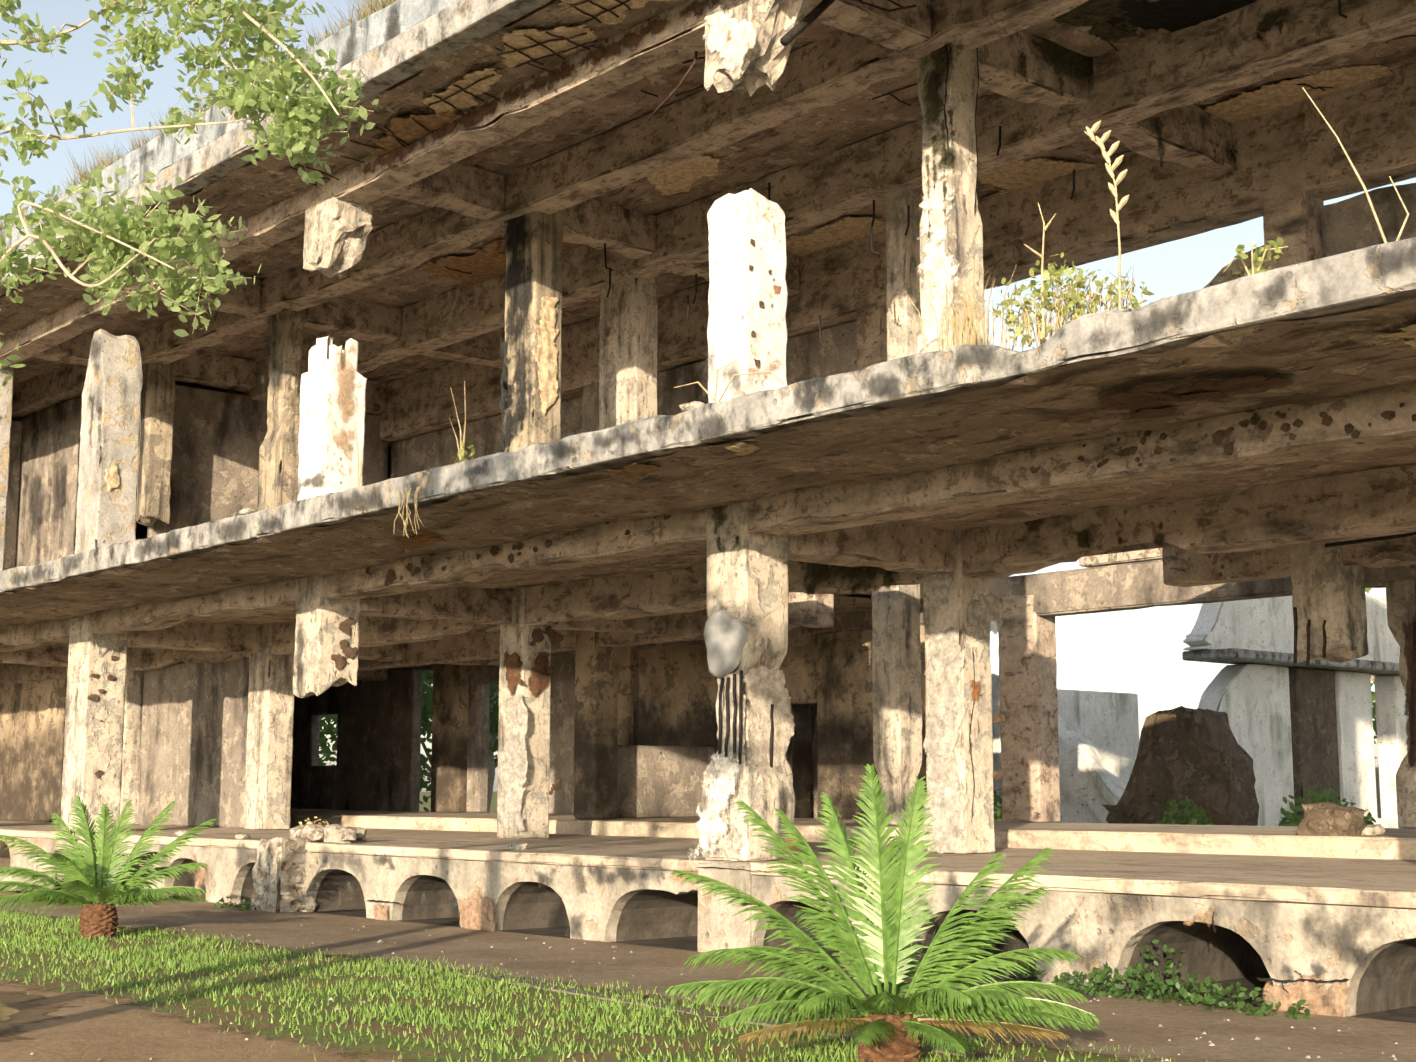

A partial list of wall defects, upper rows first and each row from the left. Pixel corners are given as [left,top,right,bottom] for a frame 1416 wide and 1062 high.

spalling [780,0,835,46]
peeling [1054,0,1139,51]
spalling [340,0,678,163]
spalling [641,5,756,120]
water stain [925,109,955,238]
water stain [1265,276,1285,302]
water stain [464,214,533,483]
water stain [955,343,1000,370]
water stain [868,374,900,397]
peeling [331,618,357,670]
rust [504,651,554,697]
spalling [671,665,795,882]